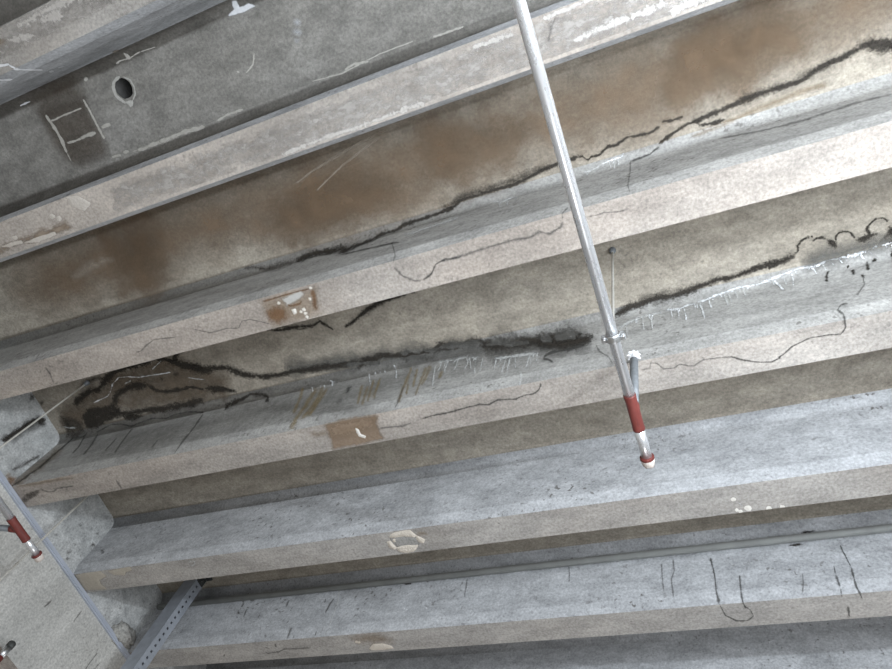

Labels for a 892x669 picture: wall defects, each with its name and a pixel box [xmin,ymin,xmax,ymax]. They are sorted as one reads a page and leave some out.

peeling [0,0,99,54]
water stain [554,0,879,131]
water stain [570,39,892,172]
water stain [44,112,558,292]
water stain [345,292,415,328]
crack [396,209,567,281]
water stain [614,217,892,331]
crack [643,279,865,370]
crack [384,384,541,428]
spalling [387,530,425,553]
crack [710,558,753,622]
crack [834,546,862,616]